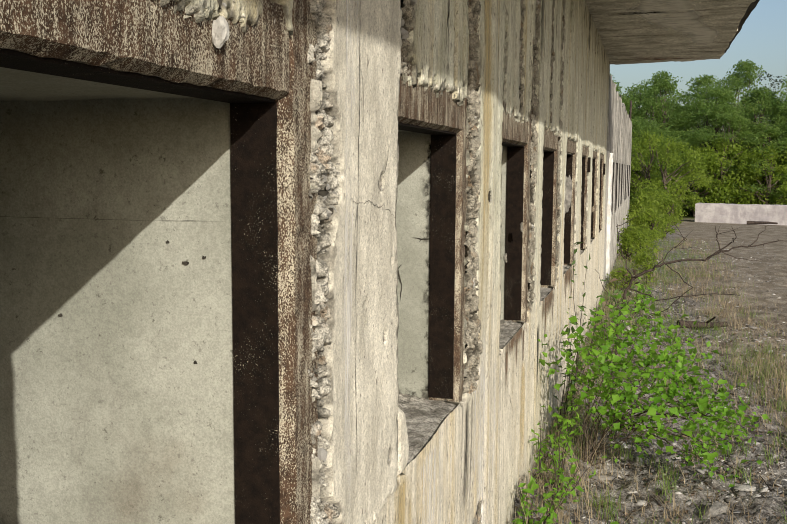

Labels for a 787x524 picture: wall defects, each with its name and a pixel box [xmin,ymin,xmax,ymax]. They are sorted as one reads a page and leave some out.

spalling [307,0,340,524]
crack [357,59,365,148]
crack [353,183,394,276]
spalling [401,0,425,82]
spalling [436,0,491,394]
spalling [519,0,541,311]
water stain [464,373,487,521]
spalling [473,501,482,524]